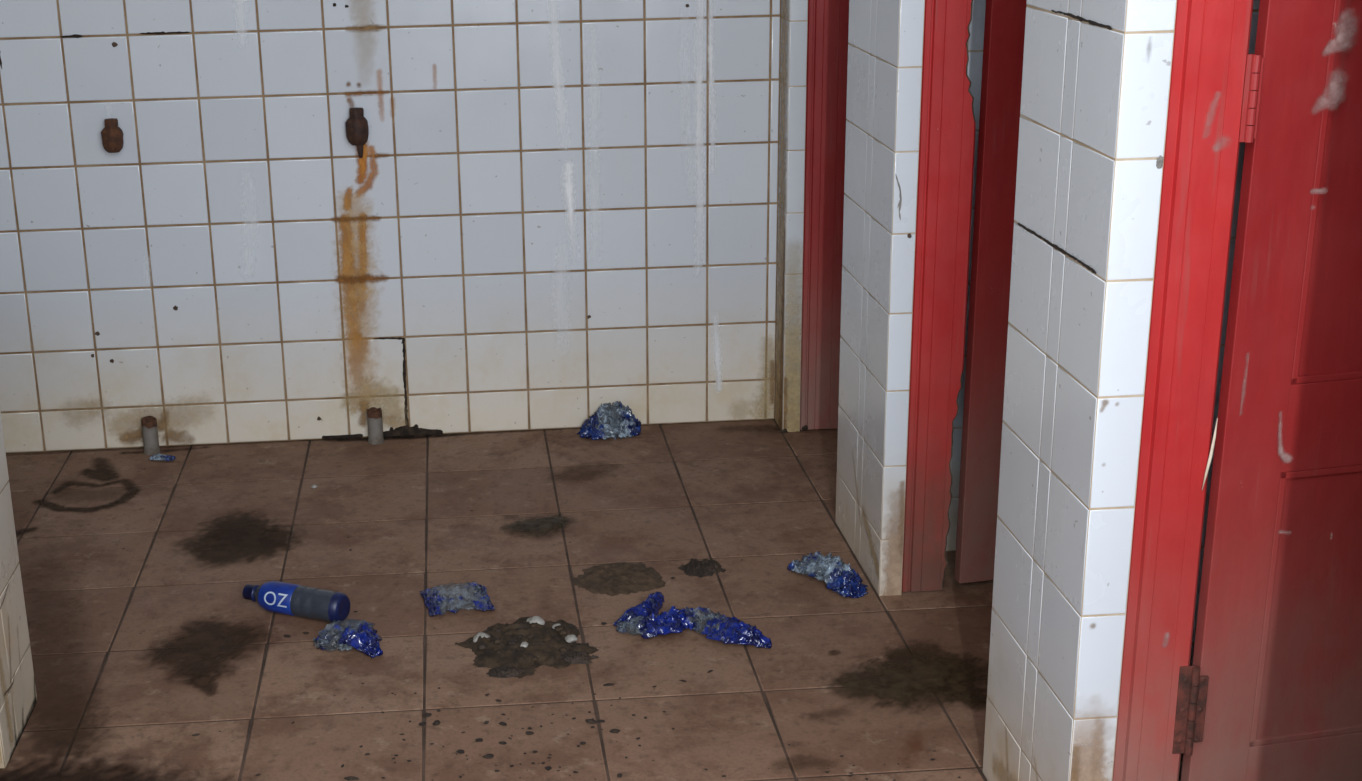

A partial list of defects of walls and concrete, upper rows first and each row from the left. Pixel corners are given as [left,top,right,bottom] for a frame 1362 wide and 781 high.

corrosion [334,144,388,362]
leakage [120,421,143,454]
leakage [1070,738,1109,781]